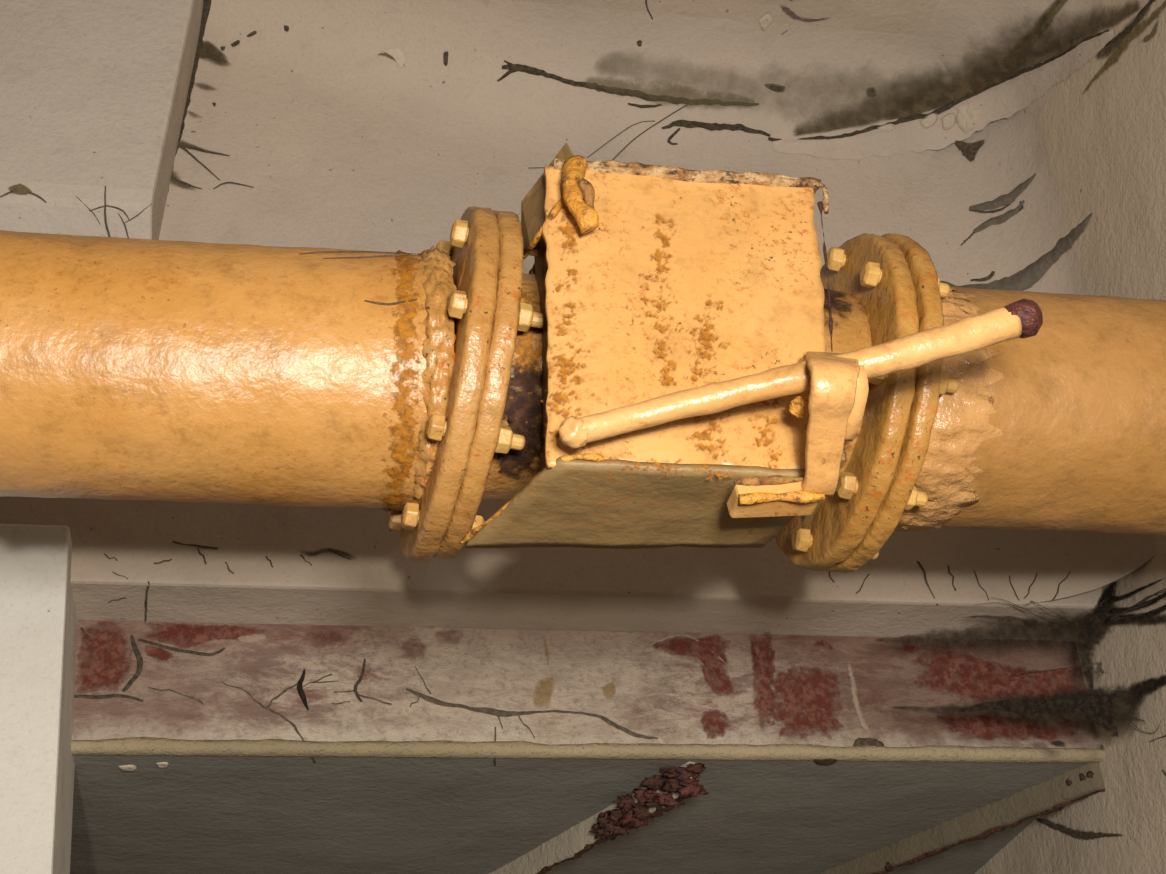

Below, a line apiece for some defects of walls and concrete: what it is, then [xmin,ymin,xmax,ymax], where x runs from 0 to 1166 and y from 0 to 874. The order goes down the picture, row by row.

leakage [1027,0,1062,36]
leakage [1083,0,1166,94]
crack [497,60,771,145]
crack [76,186,150,238]
crack [74,548,658,766]
rust [536,763,709,874]